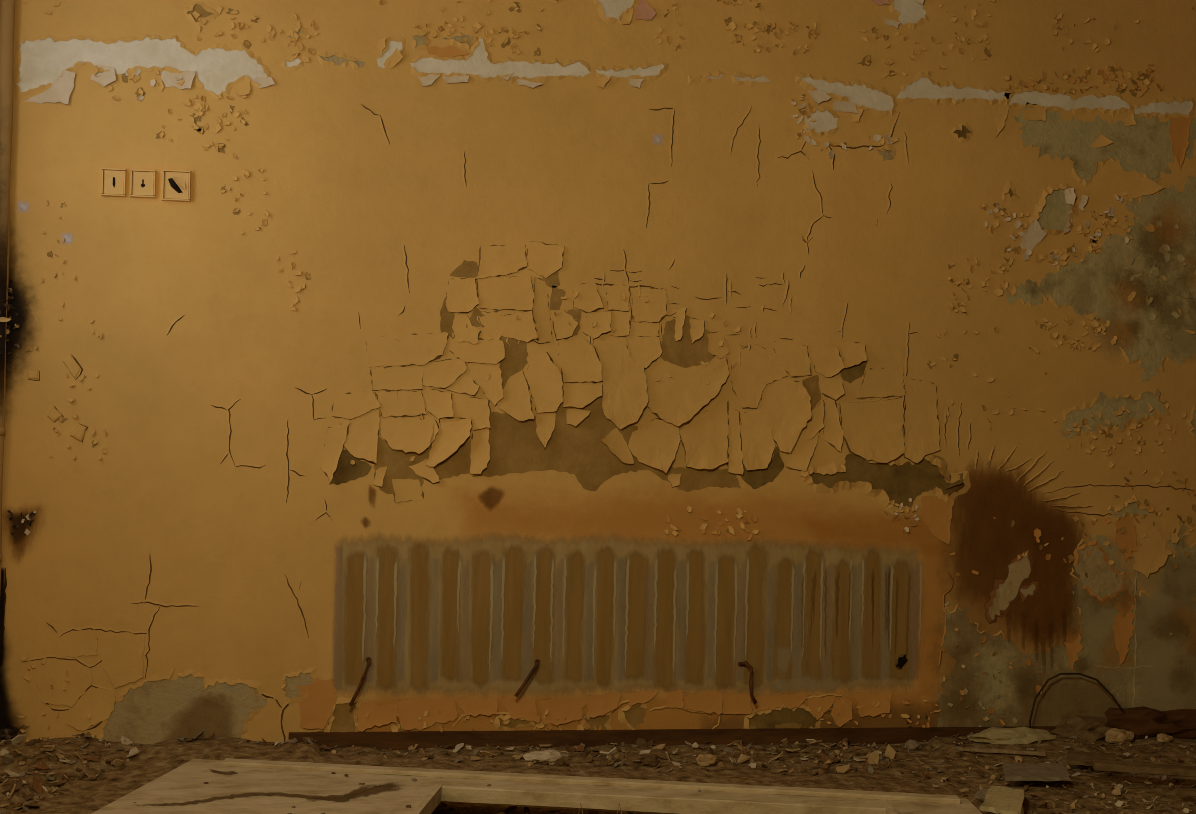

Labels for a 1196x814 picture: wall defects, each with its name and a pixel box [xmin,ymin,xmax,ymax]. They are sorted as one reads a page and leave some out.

peeling [14,0,669,234]
crack [729,106,908,306]
peeling [791,0,1196,438]
crack [0,552,199,730]
peeling [17,630,267,744]
crack [211,386,327,503]
crack [283,574,309,638]
crack [314,499,332,521]
water stain [334,536,922,693]
peeling [320,241,971,555]
peeling [280,469,1196,732]
rust [955,446,1093,640]